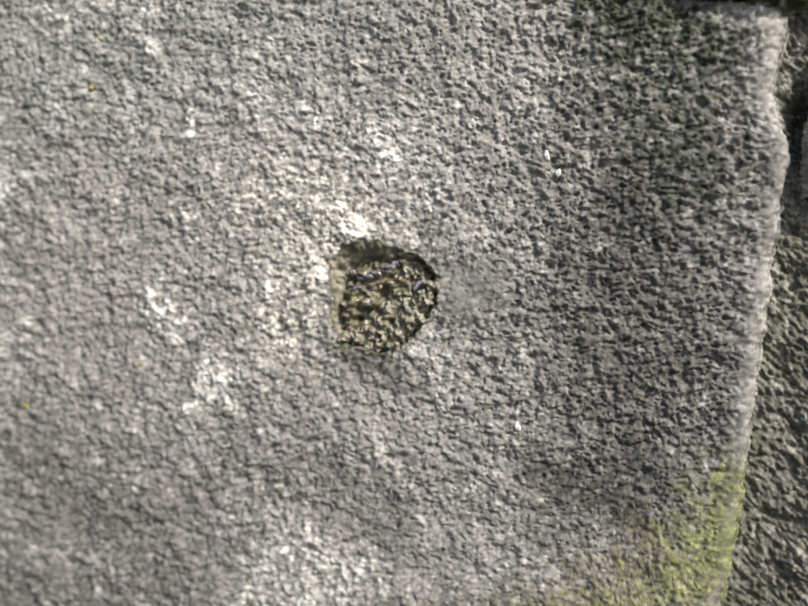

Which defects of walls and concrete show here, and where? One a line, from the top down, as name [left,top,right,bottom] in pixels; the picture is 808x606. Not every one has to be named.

damp [574,0,770,71]
efflorescence [231,546,294,606]
efflorescence [299,527,387,606]